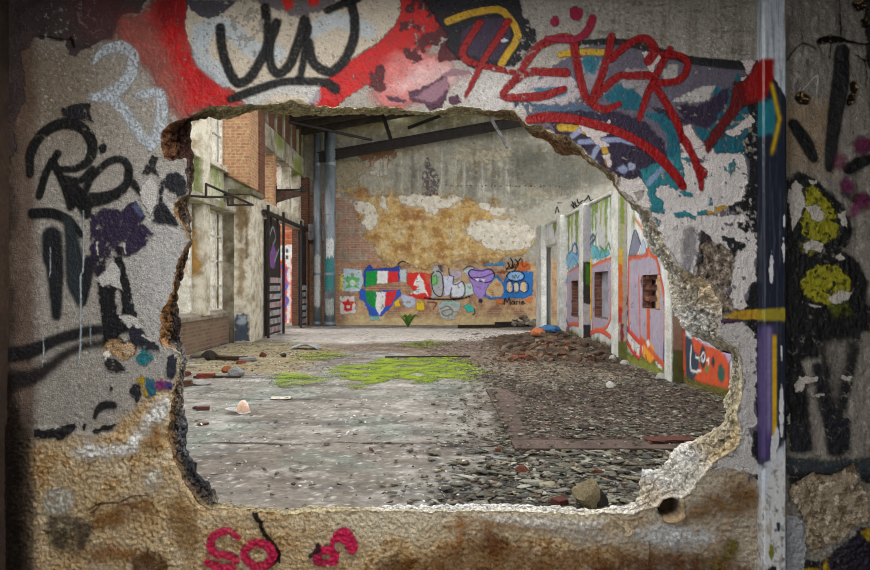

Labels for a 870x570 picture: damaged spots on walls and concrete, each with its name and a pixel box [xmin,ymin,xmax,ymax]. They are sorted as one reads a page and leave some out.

peeling [642,51,661,72]
peeling [740,58,756,81]
peeling [96,261,123,291]
spalling [103,100,758,524]
crack [252,512,281,569]
spalling [786,463,870,570]